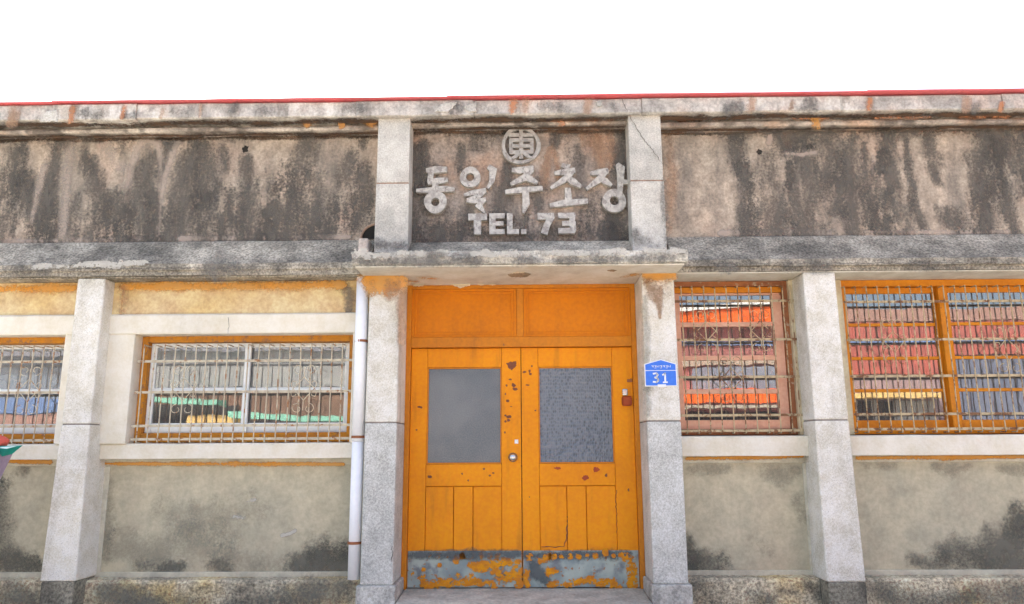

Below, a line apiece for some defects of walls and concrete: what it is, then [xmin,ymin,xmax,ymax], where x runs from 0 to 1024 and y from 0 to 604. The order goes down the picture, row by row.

water stain [0,132,378,243]
water stain [375,126,640,258]
water stain [661,125,1024,237]
peeling [504,361,533,433]
water stain [910,504,1024,570]